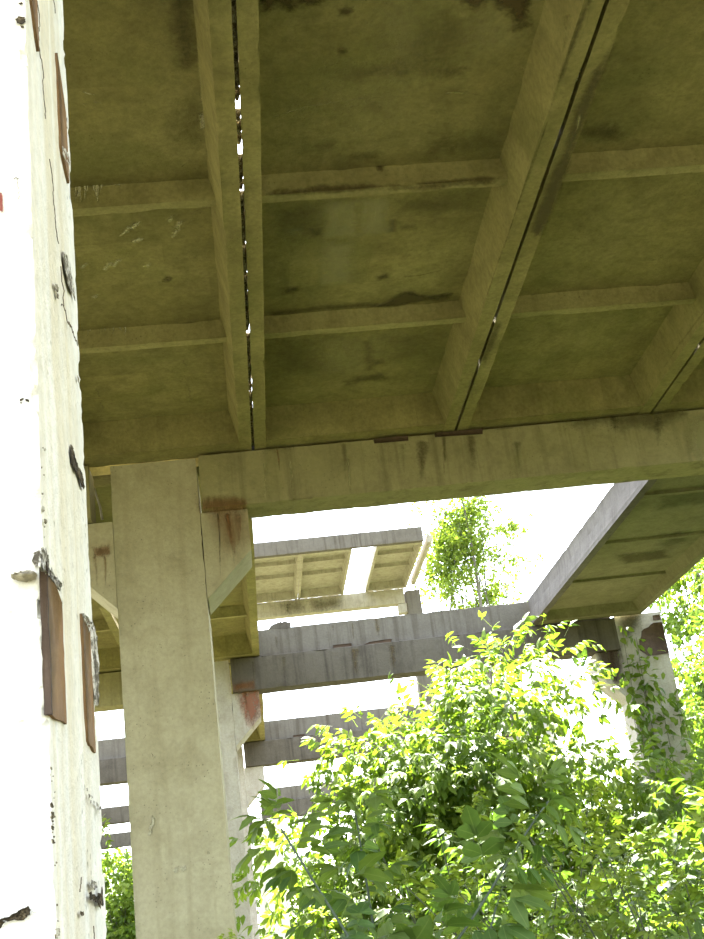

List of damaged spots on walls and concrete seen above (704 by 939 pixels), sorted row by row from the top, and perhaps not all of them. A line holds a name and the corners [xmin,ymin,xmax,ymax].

crack [49,159,78,346]
spalling [70,444,85,489]
rust [203,499,245,542]
rust [235,681,261,722]
spalling [0,906,34,929]